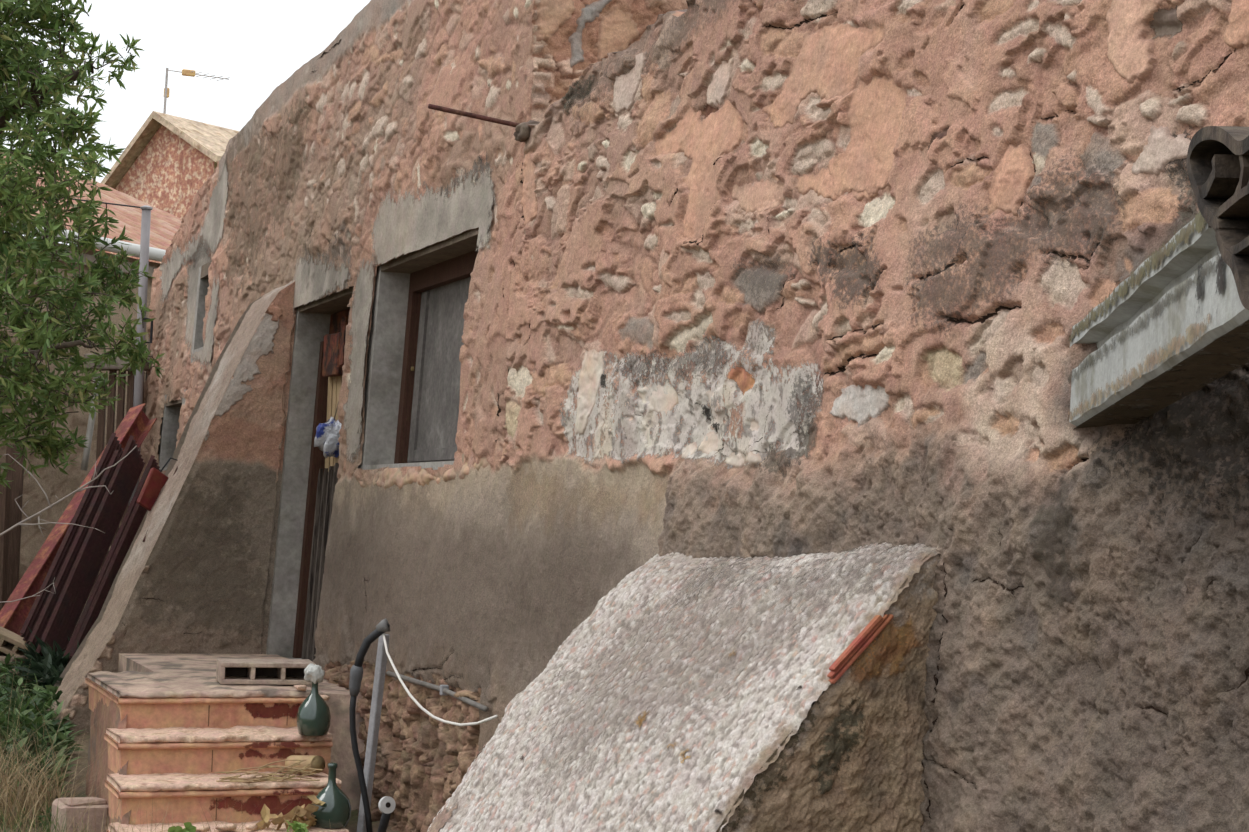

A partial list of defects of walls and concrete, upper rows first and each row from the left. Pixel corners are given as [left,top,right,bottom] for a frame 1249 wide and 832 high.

crack [918,263,955,281]
crack [946,306,1022,324]
peeling [558,321,890,469]
corrosion [851,620,919,680]
crack [922,562,1023,818]
crack [1225,667,1249,692]